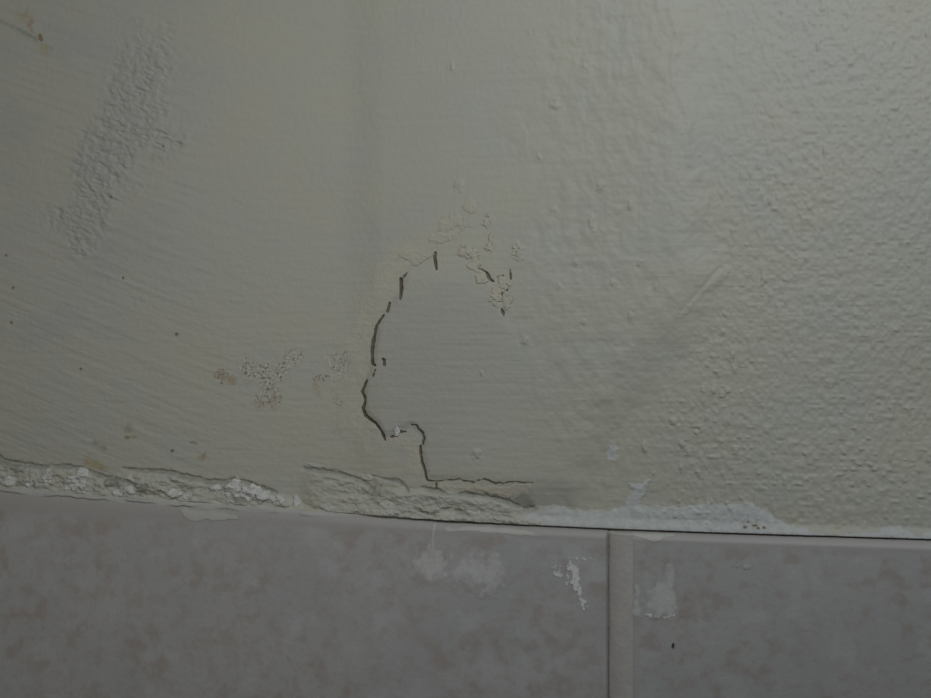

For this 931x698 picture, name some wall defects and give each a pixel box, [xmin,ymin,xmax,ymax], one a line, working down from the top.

flaking render [0,196,543,526]
crack [431,252,439,270]
crack [361,268,534,490]